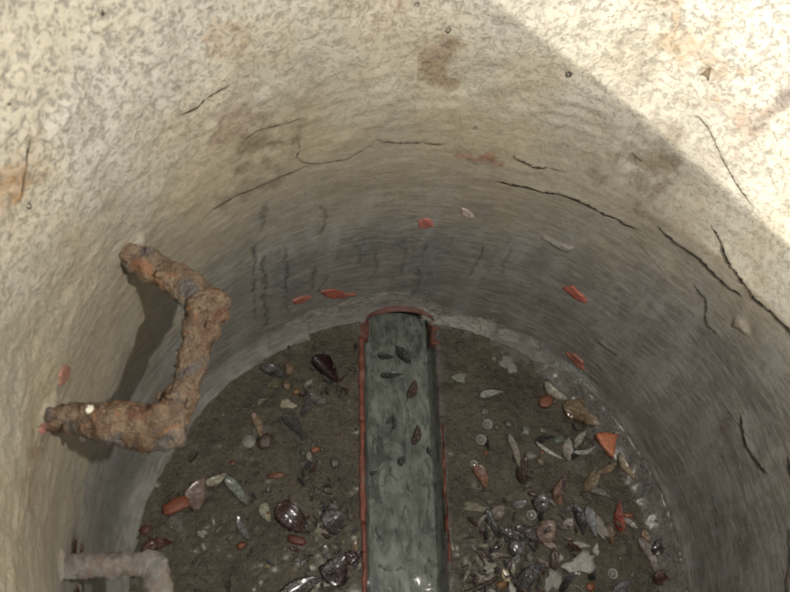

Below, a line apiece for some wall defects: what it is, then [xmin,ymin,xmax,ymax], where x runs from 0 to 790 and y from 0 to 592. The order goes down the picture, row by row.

crack [213,118,440,210]
crack [460,146,566,173]
crack [687,115,750,202]
crack [500,182,663,272]
crack [659,226,790,332]
corrosion [43,406,57,423]
crack [722,403,765,472]